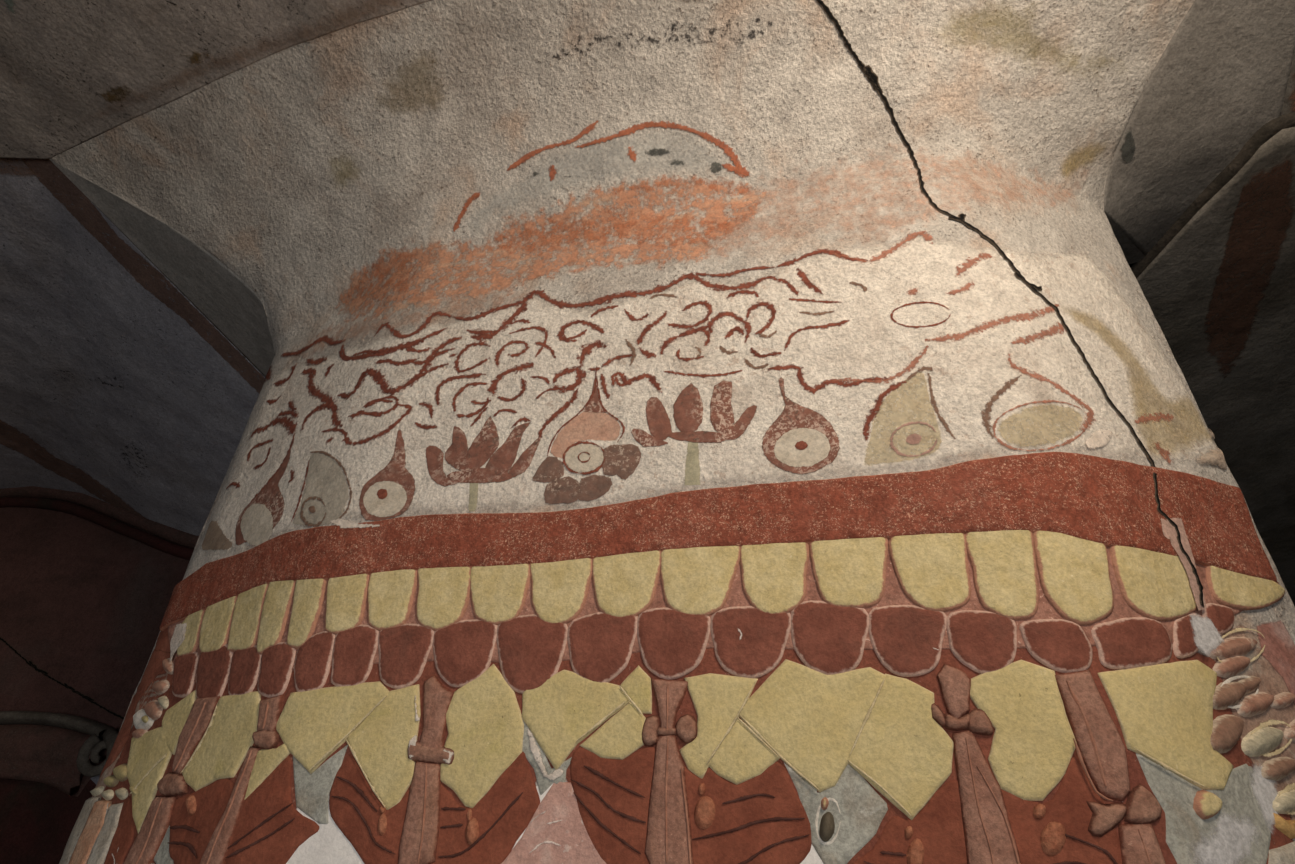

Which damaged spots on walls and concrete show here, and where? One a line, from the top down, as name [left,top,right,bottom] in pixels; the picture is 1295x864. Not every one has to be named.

crack [817,0,1204,607]
crack [0,637,124,720]